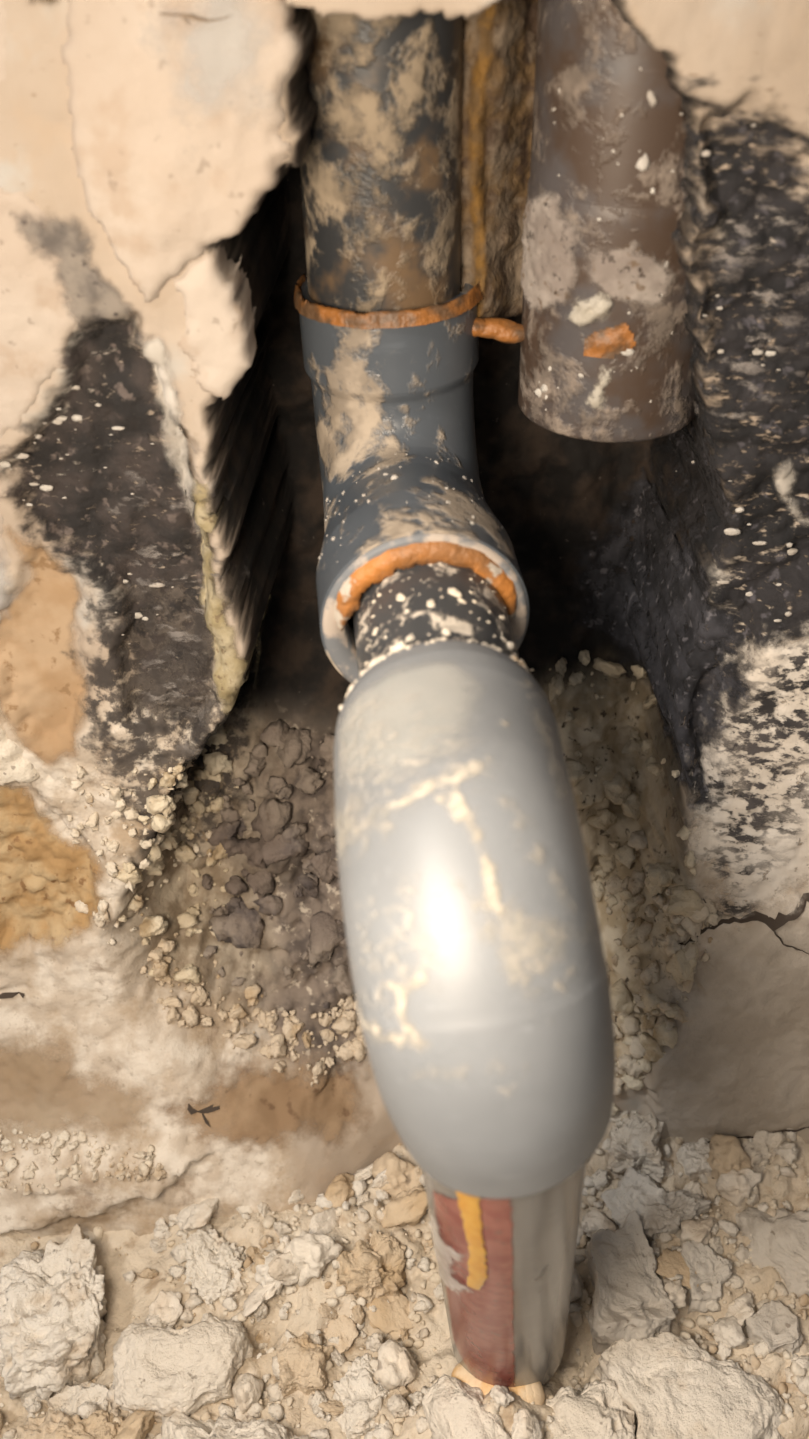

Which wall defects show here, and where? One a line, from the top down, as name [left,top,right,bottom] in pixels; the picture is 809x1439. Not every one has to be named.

spalling [0,187,271,754]
peeling [0,726,40,786]
crack [679,893,809,954]
crack [0,991,24,999]